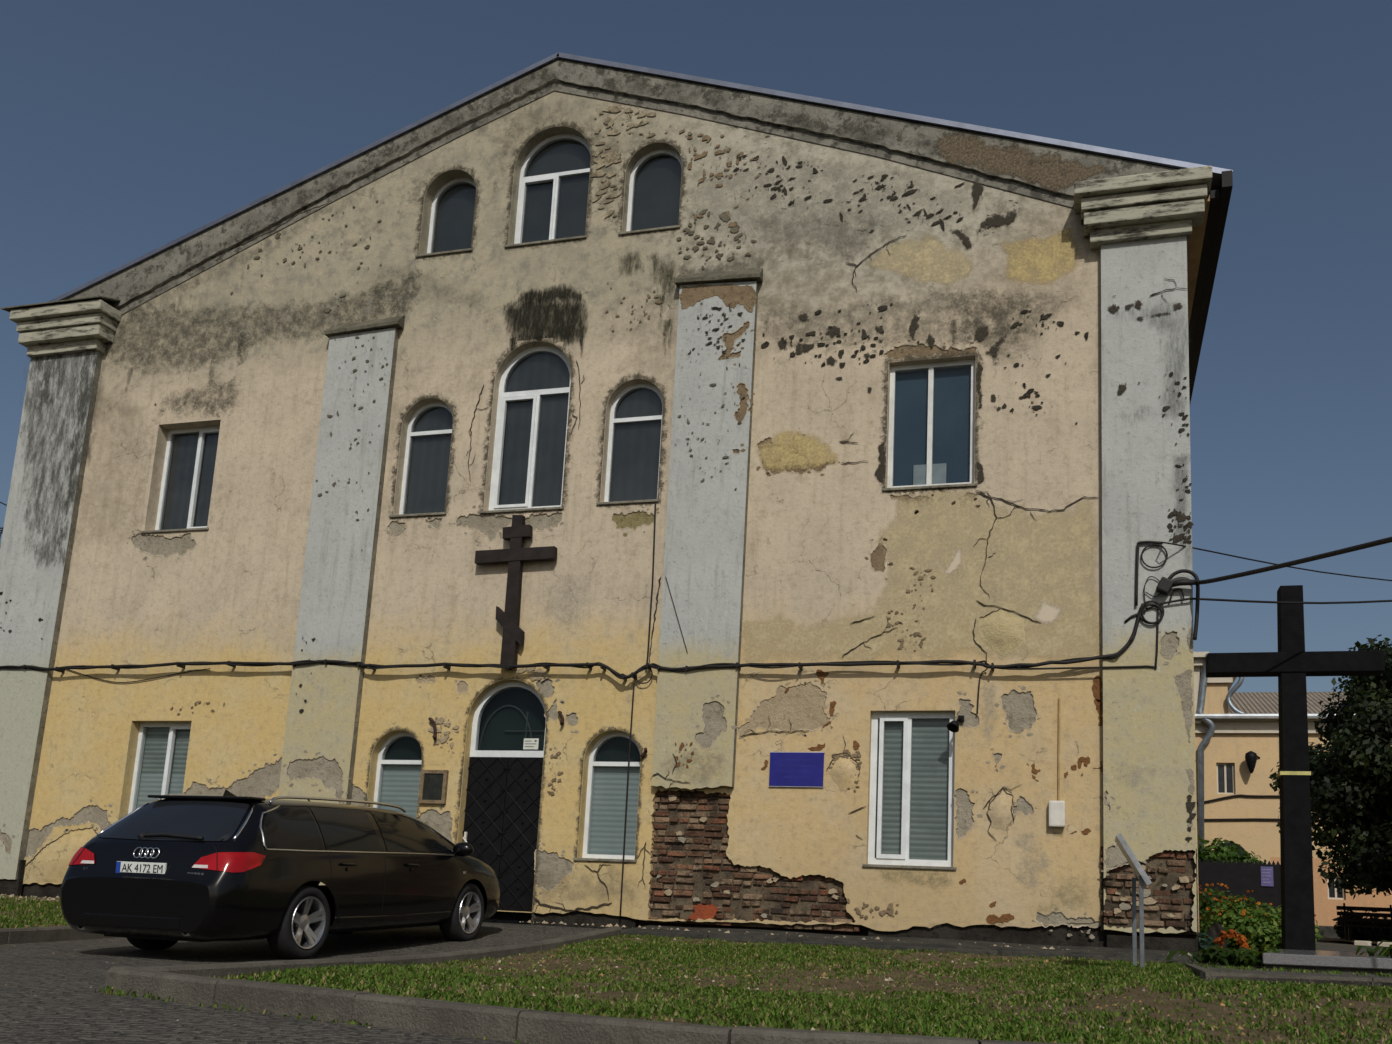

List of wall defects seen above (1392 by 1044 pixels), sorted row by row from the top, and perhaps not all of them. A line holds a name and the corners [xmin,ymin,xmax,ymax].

spalling [590,106,1109,490]
leakage [23,277,415,565]
leakage [479,285,587,516]
peeling [1159,372,1194,543]
spalling [184,750,369,806]
spalling [534,843,574,895]
spalling [675,677,831,767]
spalling [646,790,899,932]
crack [842,615,901,658]
peeling [744,441,1103,662]
crack [973,490,1099,662]
spalling [1032,768,1199,939]